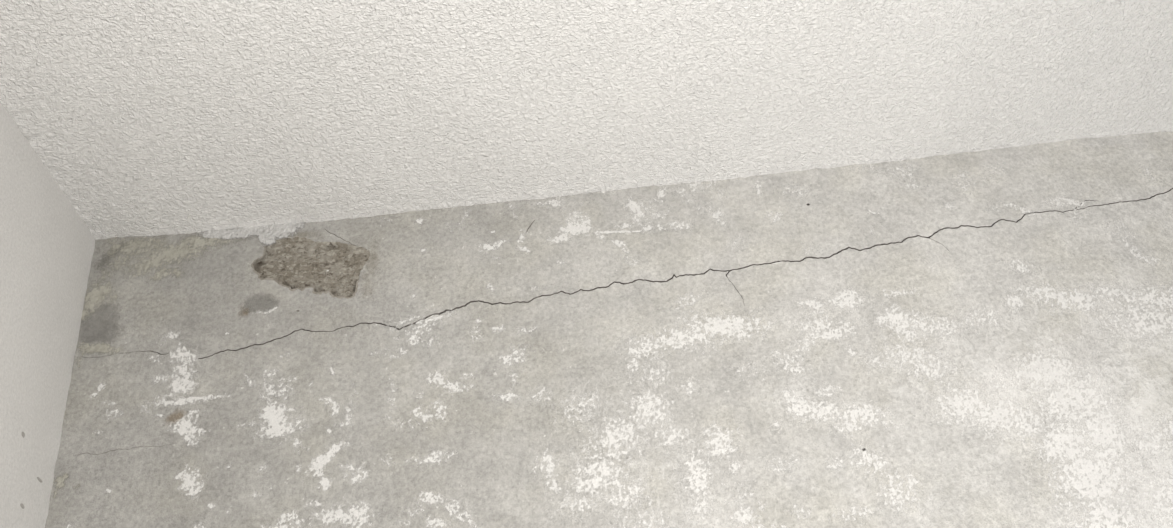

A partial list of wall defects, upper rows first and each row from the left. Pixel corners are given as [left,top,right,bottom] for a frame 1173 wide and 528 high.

spalling [251,237,370,299]
crack [84,188,1173,361]